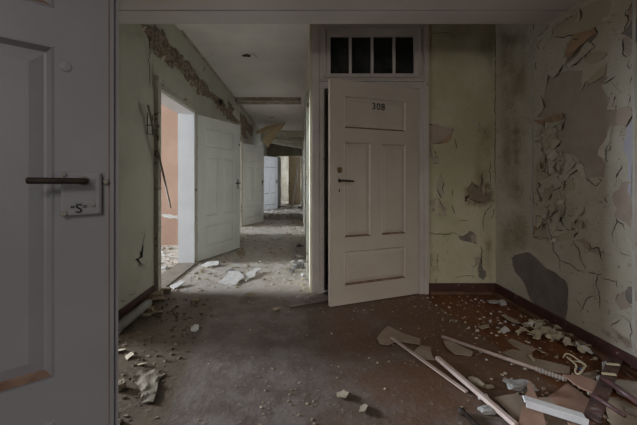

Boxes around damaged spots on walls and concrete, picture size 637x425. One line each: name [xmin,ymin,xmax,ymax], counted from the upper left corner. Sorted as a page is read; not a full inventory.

spalling [141,24,253,140]
peeling [534,28,632,230]
spalling [458,230,486,280]
peeling [465,174,492,203]
crack [535,178,618,313]